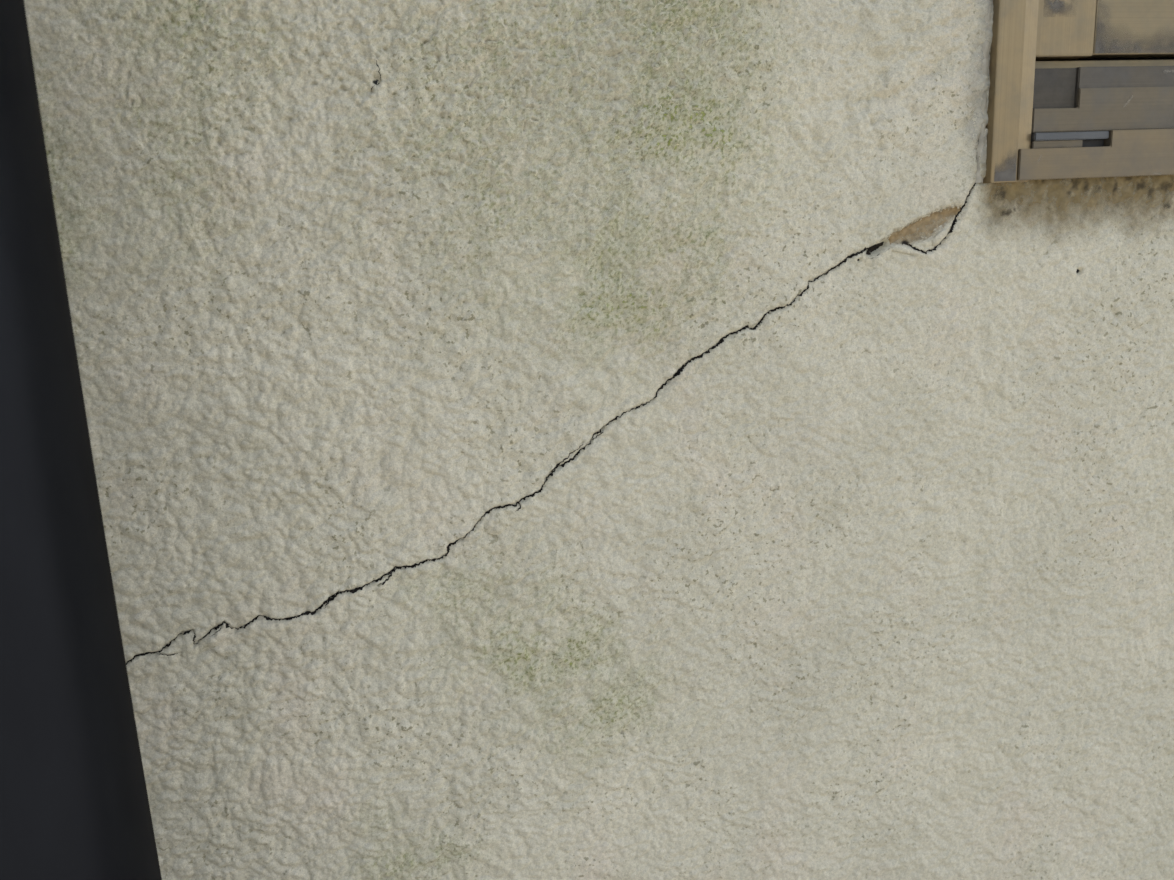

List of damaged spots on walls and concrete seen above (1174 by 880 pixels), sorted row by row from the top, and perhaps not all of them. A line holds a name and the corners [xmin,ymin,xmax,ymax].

spalling [857,206,961,261]
crack [907,127,986,254]
crack [126,244,876,665]